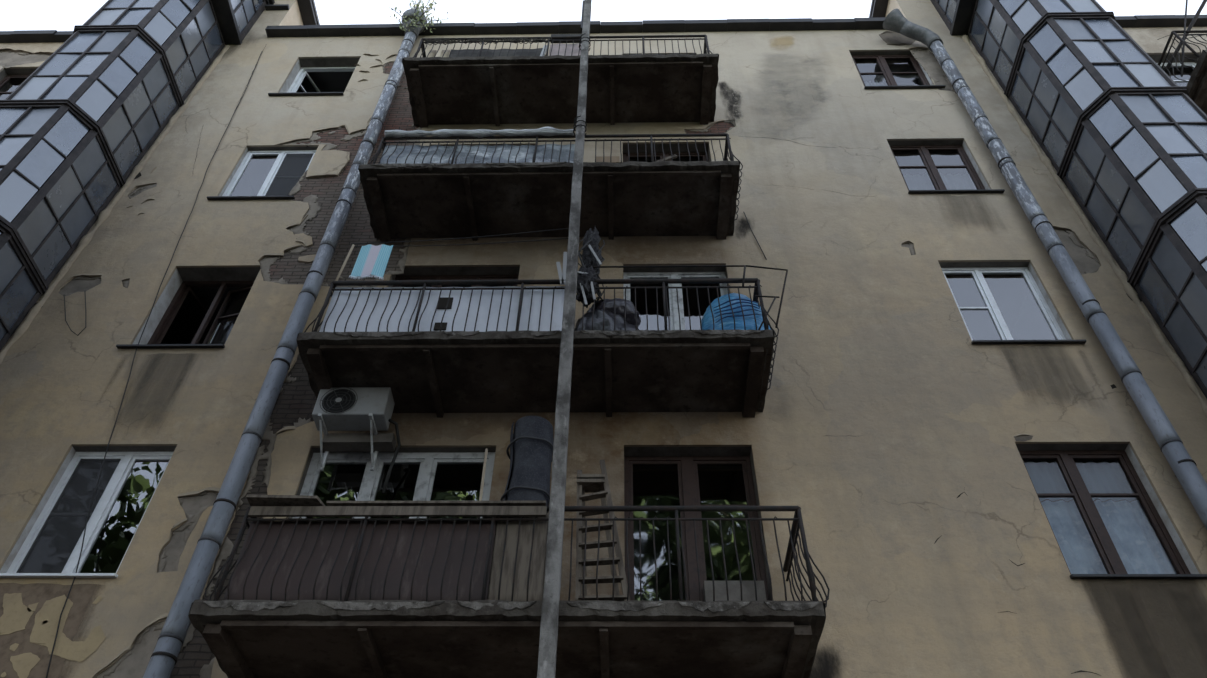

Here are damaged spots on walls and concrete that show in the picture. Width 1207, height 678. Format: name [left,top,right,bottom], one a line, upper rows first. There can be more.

spalling [684,119,736,134]
spalling [126,167,157,216]
spalling [258,54,422,288]
spalling [58,273,103,296]
spalling [313,322,424,338]
spalling [202,354,536,611]
spalling [157,487,220,573]
peeling [0,583,106,678]
spalling [92,613,169,678]
spalling [170,623,215,678]